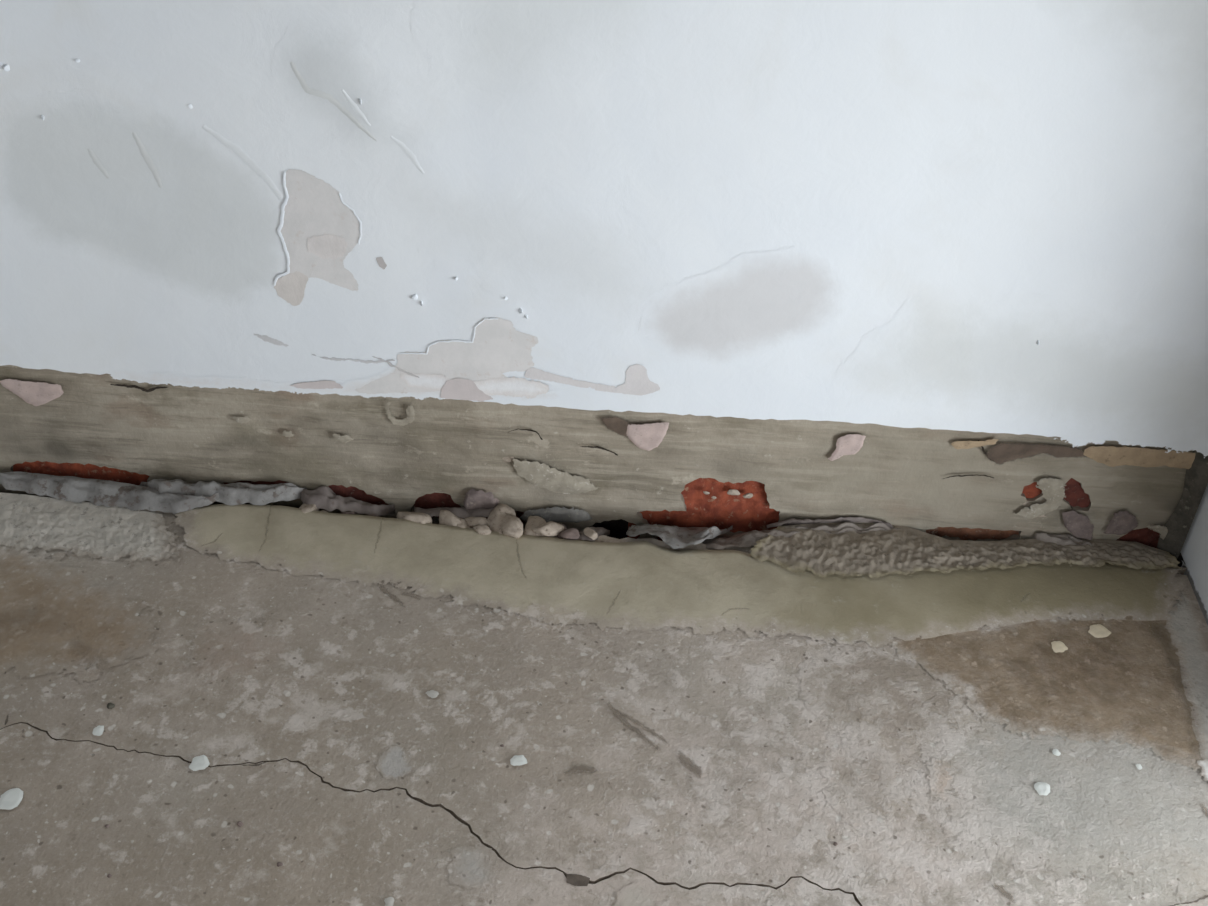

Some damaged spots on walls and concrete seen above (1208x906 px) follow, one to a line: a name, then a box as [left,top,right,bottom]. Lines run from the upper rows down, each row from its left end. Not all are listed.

damp [0,88,287,310]
damp [269,0,850,367]
peeling [273,169,362,306]
peeling [111,317,660,402]
flaking render [600,417,631,437]
flaking render [13,461,149,485]
flaking render [328,485,395,511]
flaking render [413,493,463,519]
flaking render [589,478,779,541]
flaking render [926,527,1019,541]
crack [0,716,862,906]
crack [1171,895,1208,906]